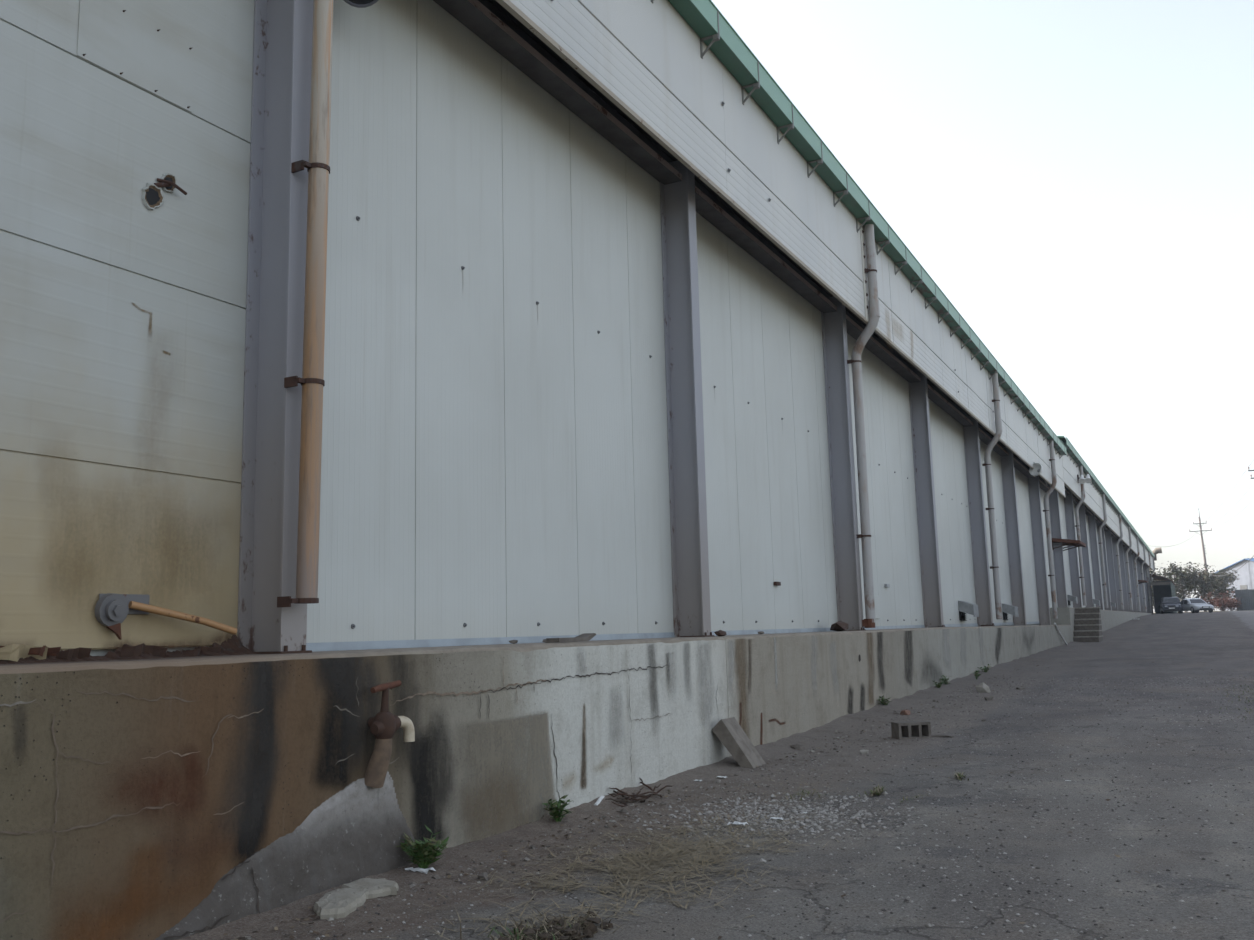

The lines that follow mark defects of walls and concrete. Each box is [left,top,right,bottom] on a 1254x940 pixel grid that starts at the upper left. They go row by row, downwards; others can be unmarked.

crack [141,709,263,776]
damp [236,661,277,859]
damp [317,657,377,787]
damp [412,725,450,843]
crack [394,662,671,782]
damp [848,632,884,714]